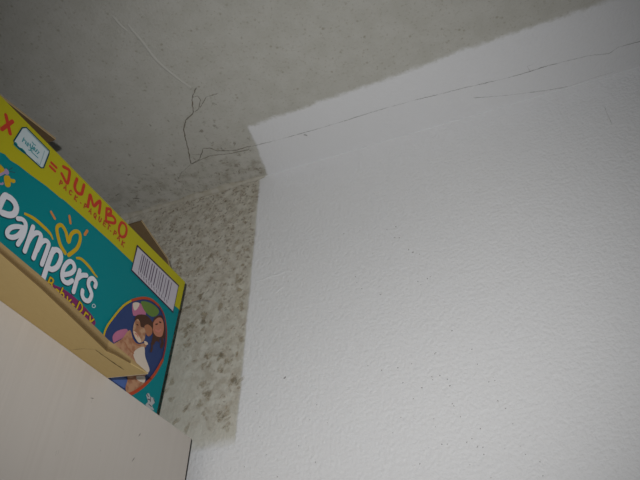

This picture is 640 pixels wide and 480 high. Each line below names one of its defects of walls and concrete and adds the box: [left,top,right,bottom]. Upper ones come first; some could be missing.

crack [183,89,268,164]